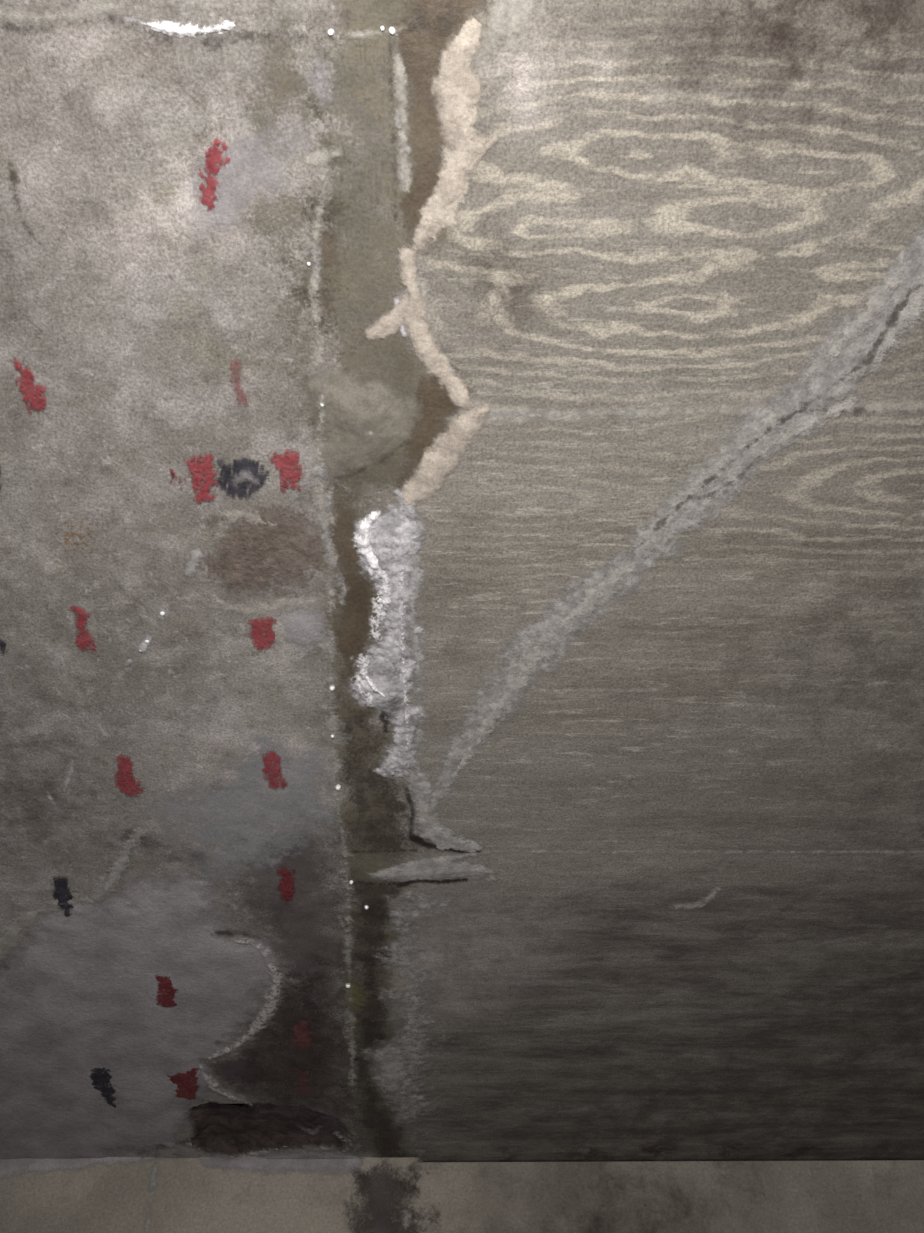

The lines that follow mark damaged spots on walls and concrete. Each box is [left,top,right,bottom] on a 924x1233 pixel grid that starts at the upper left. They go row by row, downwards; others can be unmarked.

crack [0,0,133,28]
water stain [126,19,235,37]
crack [331,32,411,192]
water stain [148,0,540,1233]
crack [184,168,924,1086]
flaking render [0,872,362,1178]